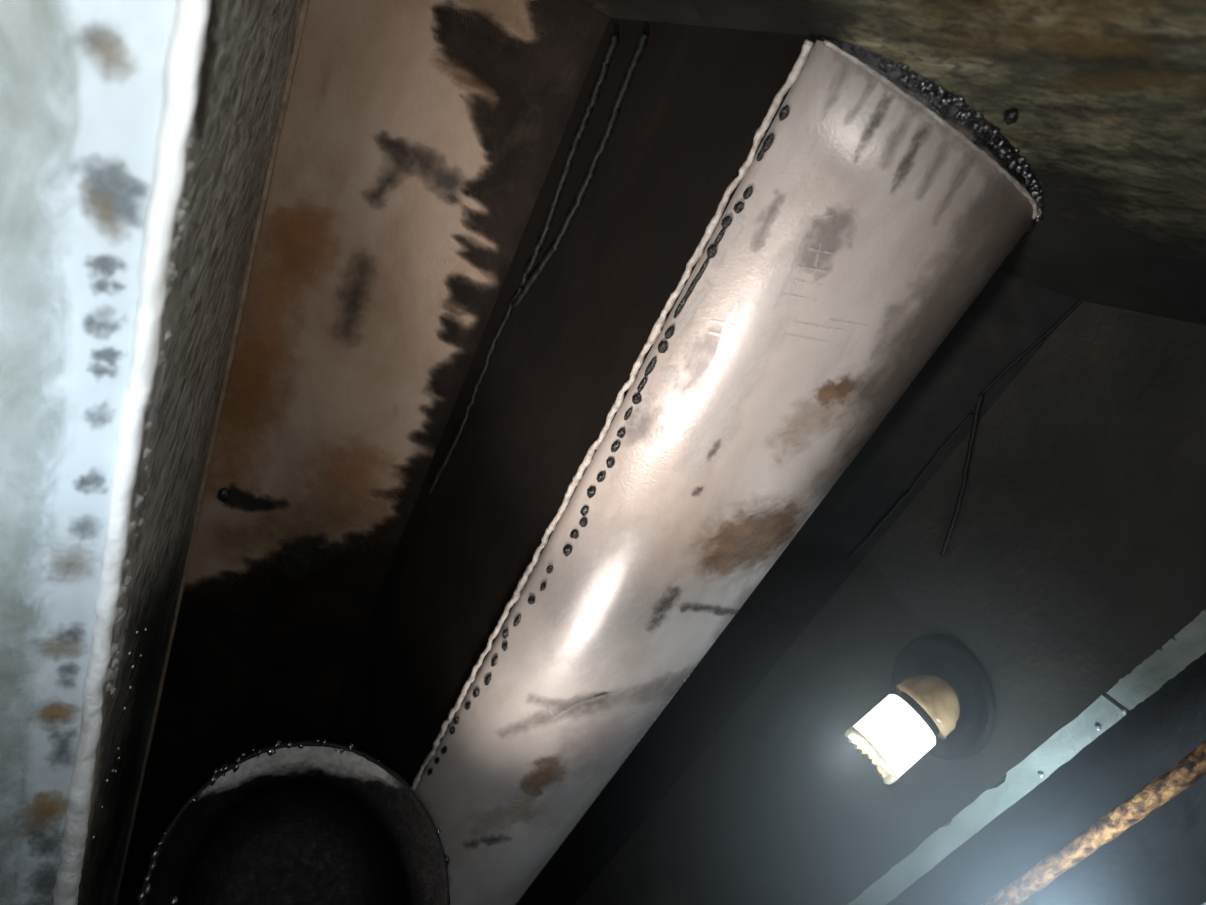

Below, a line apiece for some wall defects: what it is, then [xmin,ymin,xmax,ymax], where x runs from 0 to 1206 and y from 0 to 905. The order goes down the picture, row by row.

water stain [863,99,888,141]
water stain [370,136,463,200]
water stain [898,129,926,180]
water stain [90,166,144,231]
water stain [89,257,123,291]
water stain [86,317,114,330]
water stain [94,349,117,376]
rust [790,379,854,434]
water stain [79,476,100,488]
rust [706,509,796,569]